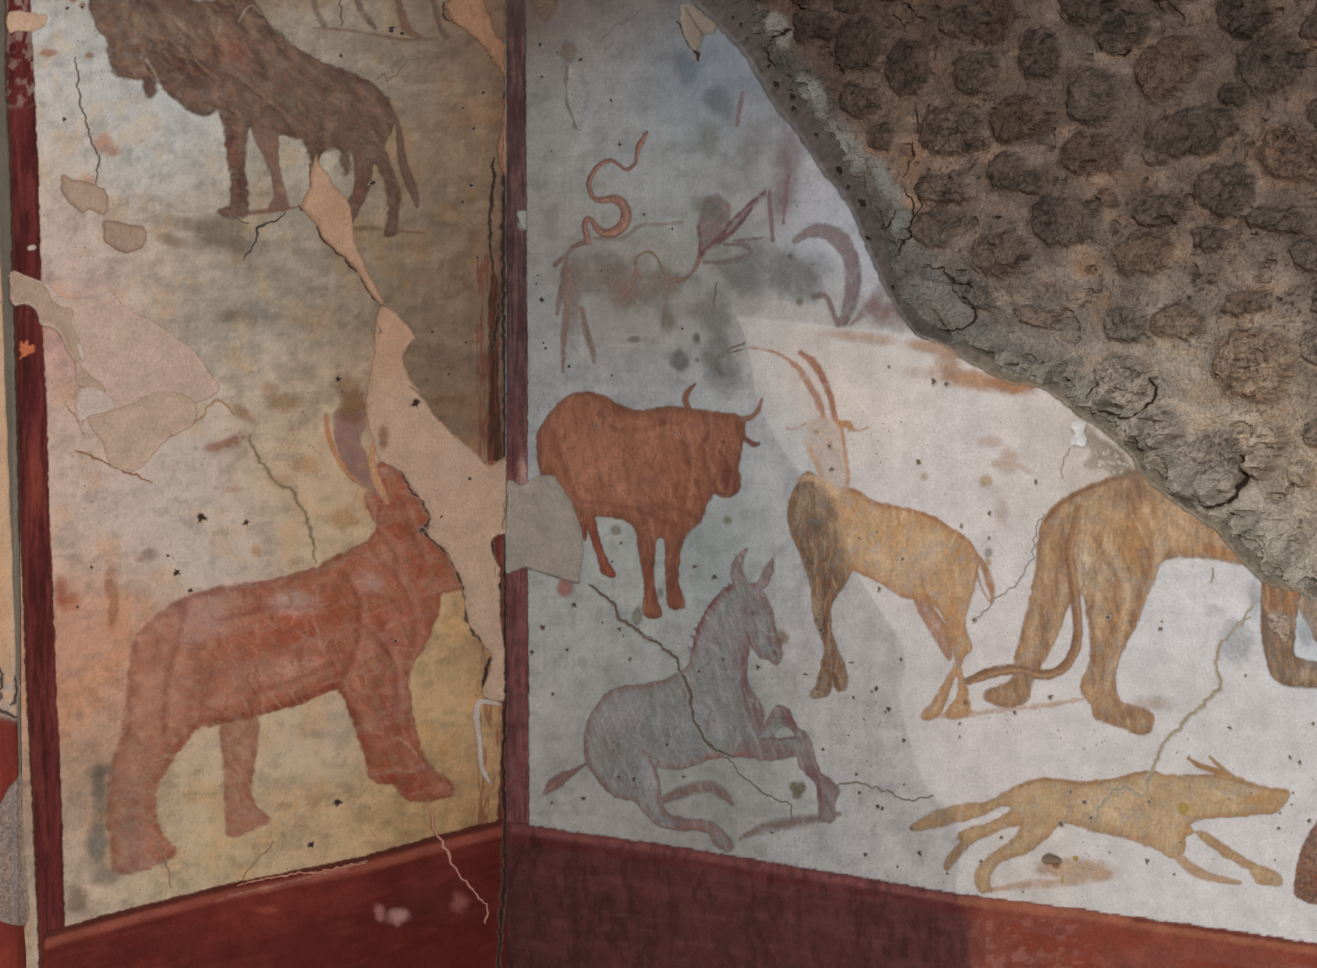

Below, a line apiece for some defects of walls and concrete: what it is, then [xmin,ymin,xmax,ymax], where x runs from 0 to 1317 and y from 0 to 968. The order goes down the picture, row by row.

spalling [61,175,146,253]
peeling [10,271,219,472]
spalling [302,155,506,784]
spalling [680,0,1317,602]
crack [400,467,507,968]
crack [588,584,792,822]
crack [835,781,934,802]
crack [1093,602,1256,825]
spalling [1268,610,1291,642]